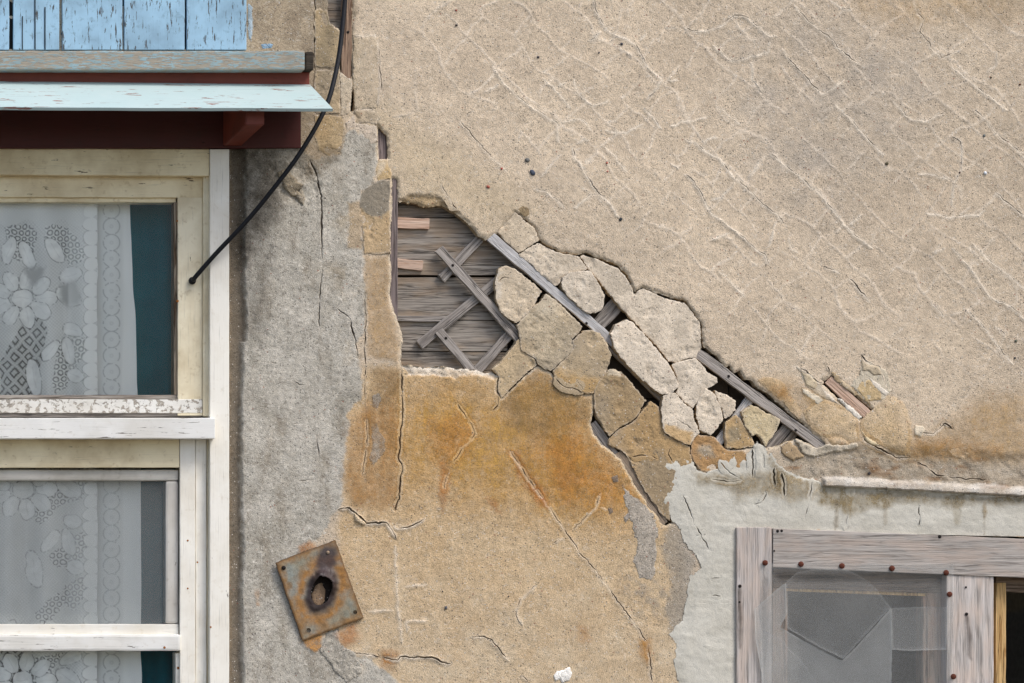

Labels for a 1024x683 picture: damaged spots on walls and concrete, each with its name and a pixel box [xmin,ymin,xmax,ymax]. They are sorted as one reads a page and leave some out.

crack [542,0,886,219]
crack [669,105,875,266]
crack [949,64,1024,162]
crack [823,264,872,304]
crack [925,191,1024,366]
crack [307,160,503,668]
damp [349,374,639,511]
spalling [780,360,892,461]
crack [508,450,656,683]